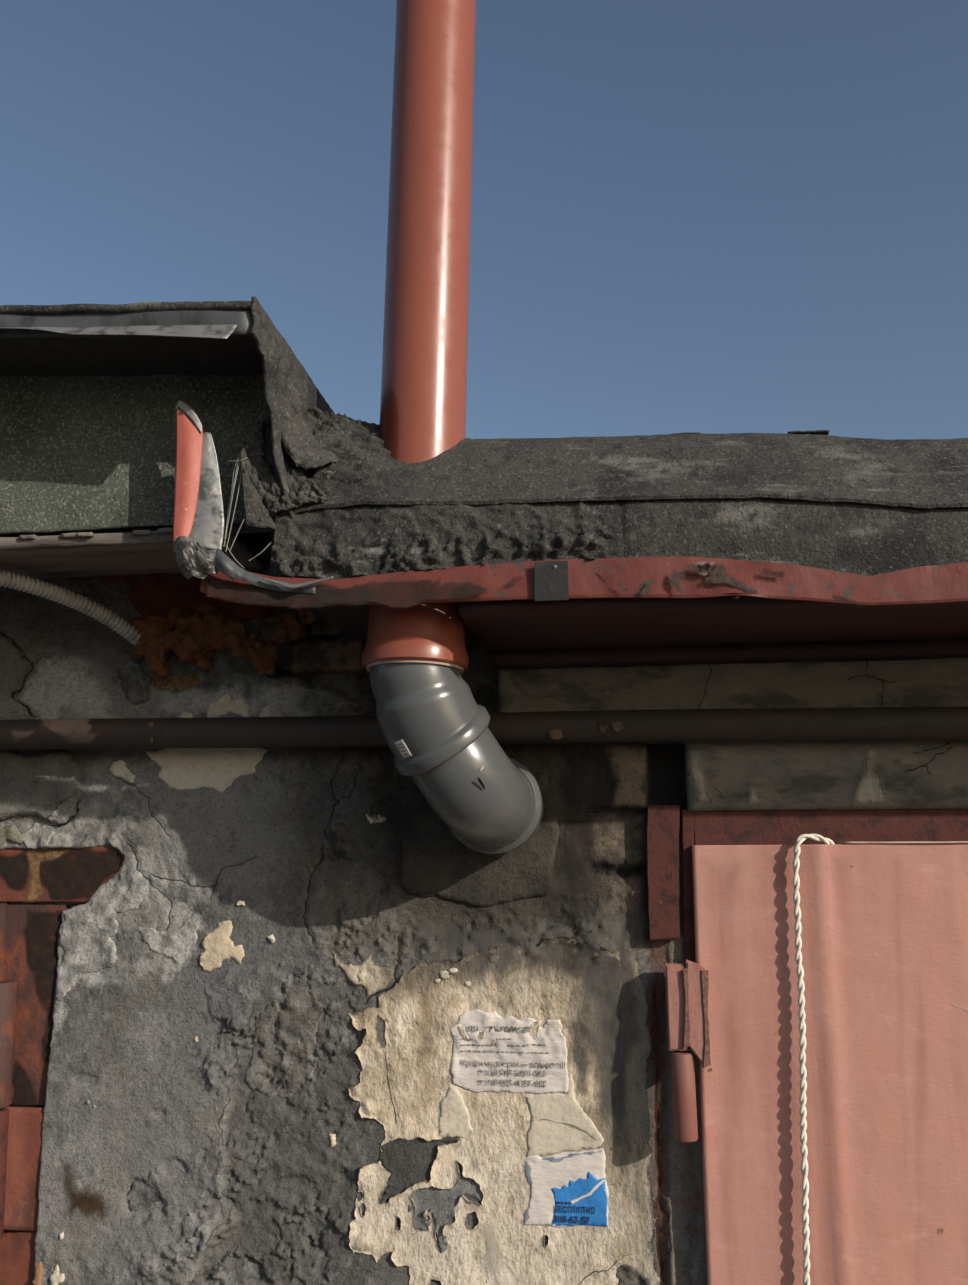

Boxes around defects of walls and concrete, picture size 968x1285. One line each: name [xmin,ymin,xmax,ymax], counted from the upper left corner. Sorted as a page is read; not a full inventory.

peeling [98,573,277,624]
peeling [179,694,271,718]
peeling [109,760,135,783]
peeling [144,748,267,793]
crack [117,778,172,840]
crack [303,755,360,939]
crack [127,842,262,930]
rust [0,849,122,1062]
rust [12,1063,35,1105]
peeling [333,936,661,1285]
crack [578,986,673,1285]